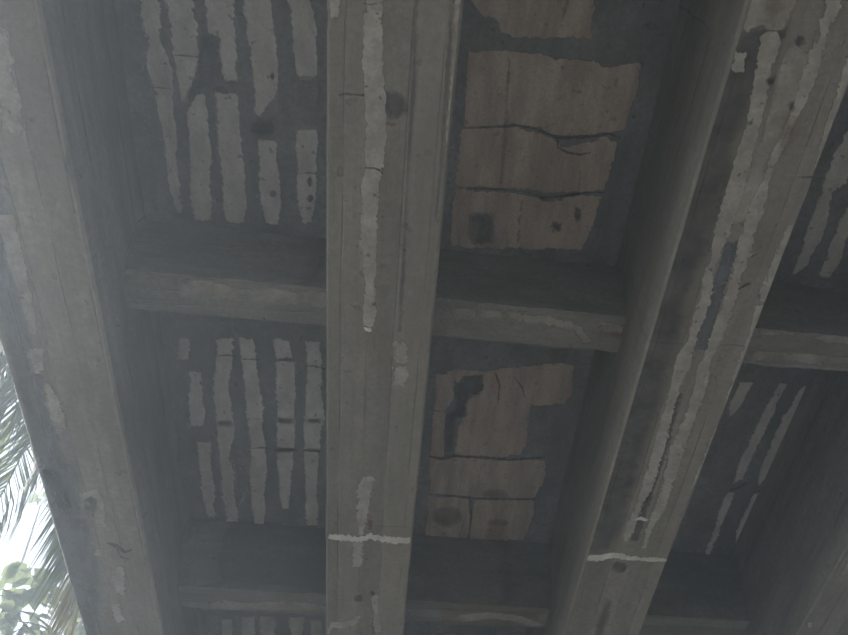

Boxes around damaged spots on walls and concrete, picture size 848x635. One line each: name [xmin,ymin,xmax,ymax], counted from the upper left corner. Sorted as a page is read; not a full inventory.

peeling [140,0,281,225]
peeling [287,0,318,77]
peeling [295,129,318,224]
peeling [358,0,388,332]
peeling [444,0,461,172]
peeling [471,0,595,40]
peeling [450,50,641,251]
crack [481,123,620,156]
peeling [623,0,848,555]
peeling [188,337,267,524]
peeling [273,338,325,526]
peeling [425,362,574,541]